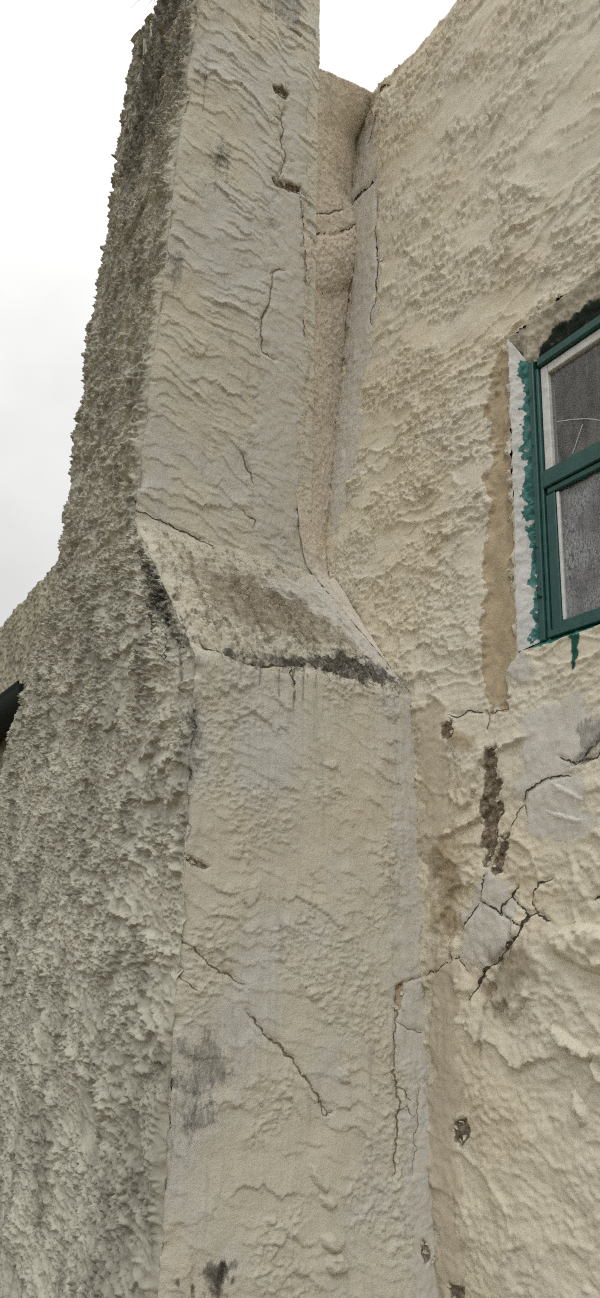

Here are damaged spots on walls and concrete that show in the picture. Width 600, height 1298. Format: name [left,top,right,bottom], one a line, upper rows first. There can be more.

crack [260,268,284,360]
crack [511,738,600,826]
crack [391,875,554,1176]
leakage [203,1261,233,1298]